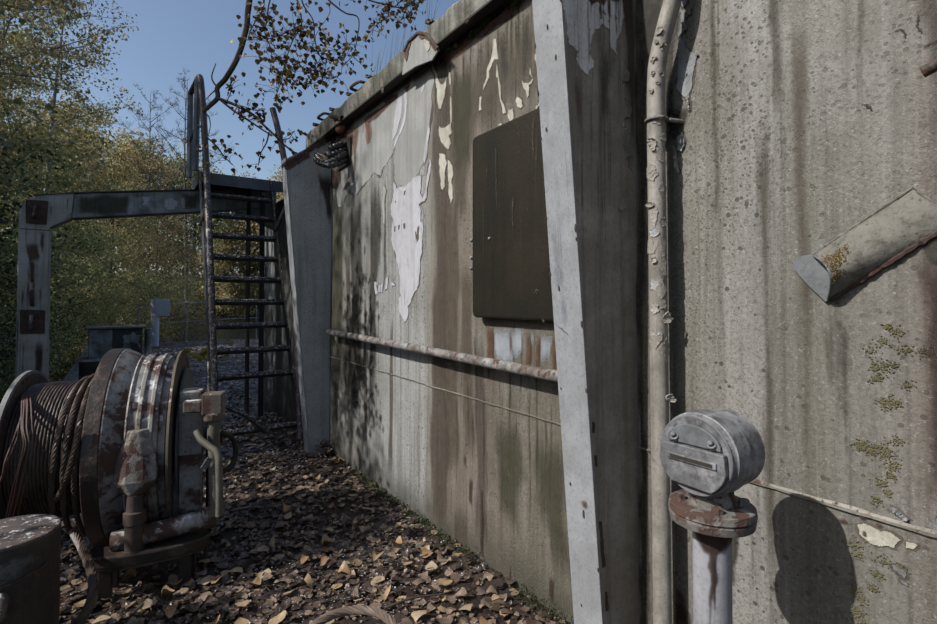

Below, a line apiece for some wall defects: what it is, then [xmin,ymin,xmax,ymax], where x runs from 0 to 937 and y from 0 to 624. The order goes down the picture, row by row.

rust [404,0,525,62]
peeling [479,38,539,126]
peeling [560,0,624,75]
rust [589,0,635,127]
peeling [649,0,699,113]
peeling [337,63,454,323]
water stain [759,153,768,271]
water stain [796,70,807,255]
water stain [330,190,386,430]
water stain [444,209,484,456]
water stain [499,425,570,564]
peeling [855,522,920,552]